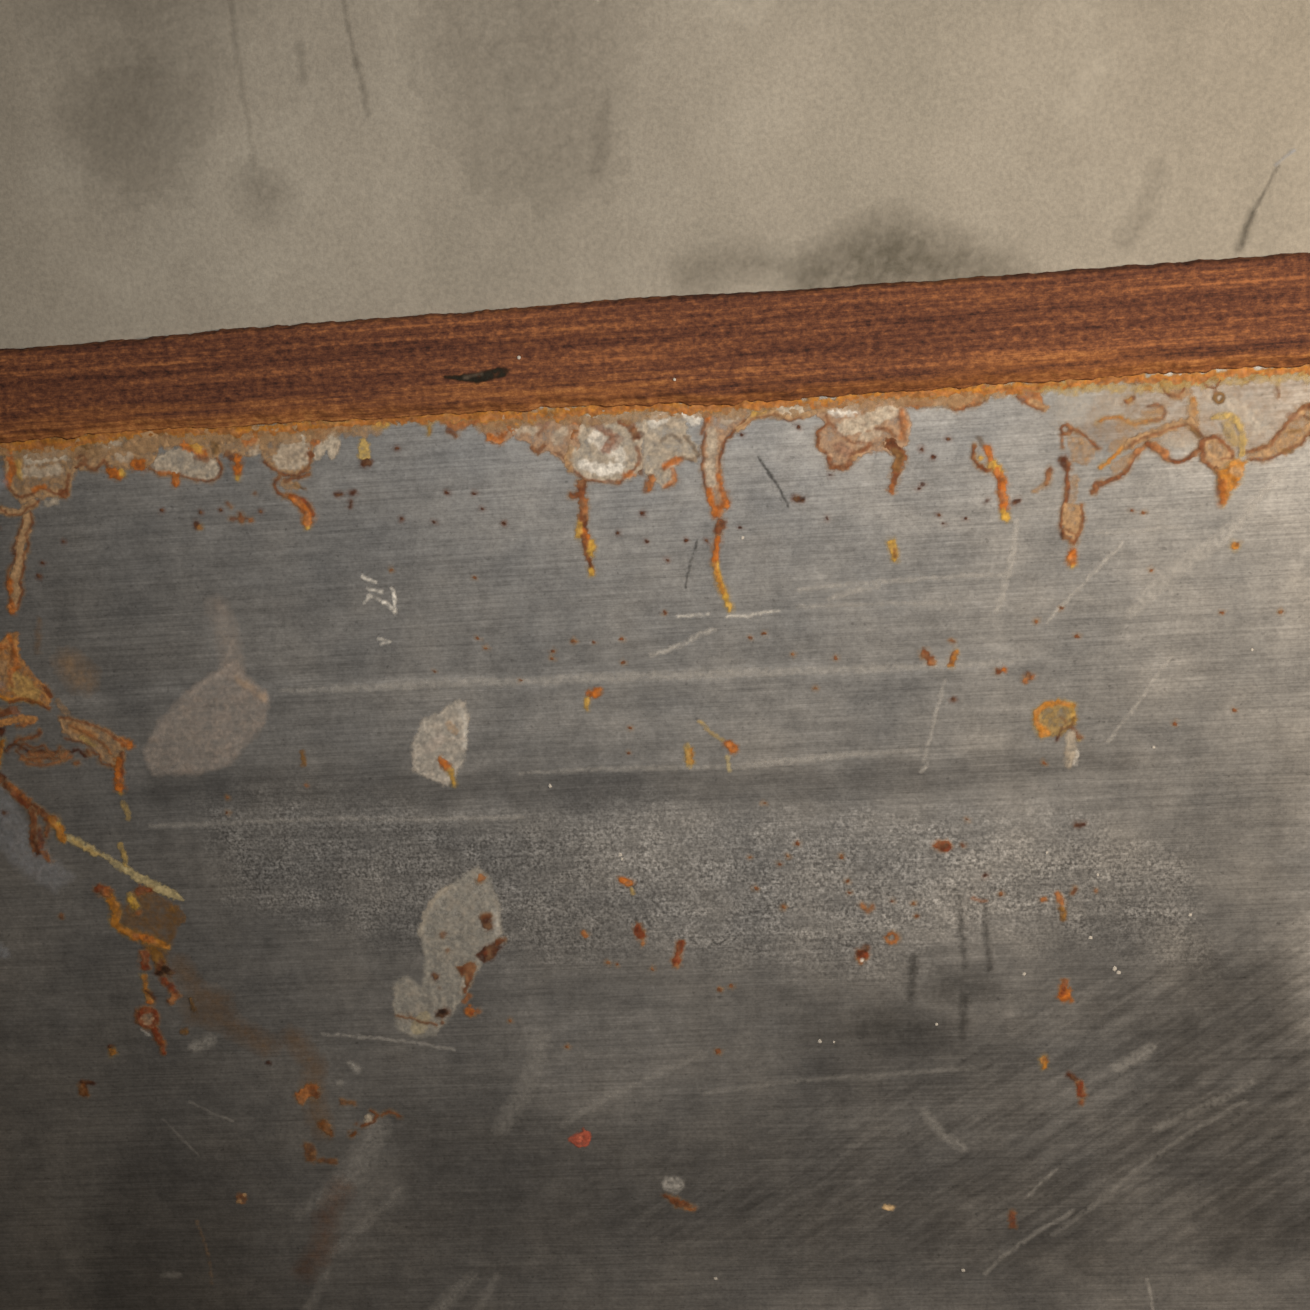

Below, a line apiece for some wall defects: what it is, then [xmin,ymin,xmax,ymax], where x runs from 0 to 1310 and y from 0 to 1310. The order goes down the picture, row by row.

corrosion [0,364,1310,614]
corrosion [0,633,133,862]
corrosion [1033,699,1083,767]
corrosion [94,884,196,1055]